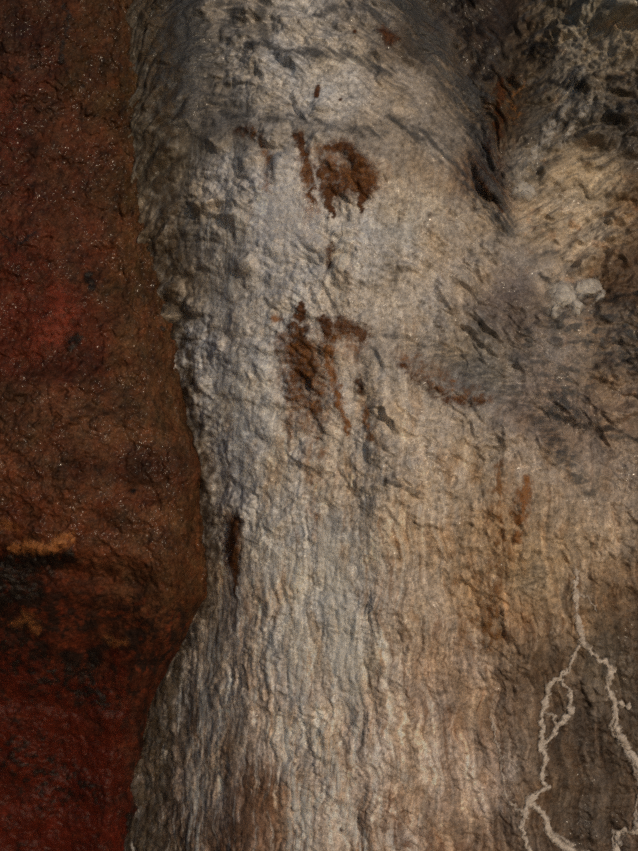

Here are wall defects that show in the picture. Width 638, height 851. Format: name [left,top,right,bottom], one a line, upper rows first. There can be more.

rust [292,131,378,218]
rust [326,242,335,269]
rust [271,301,371,436]
rust [363,406,374,441]
rust [226,516,241,595]